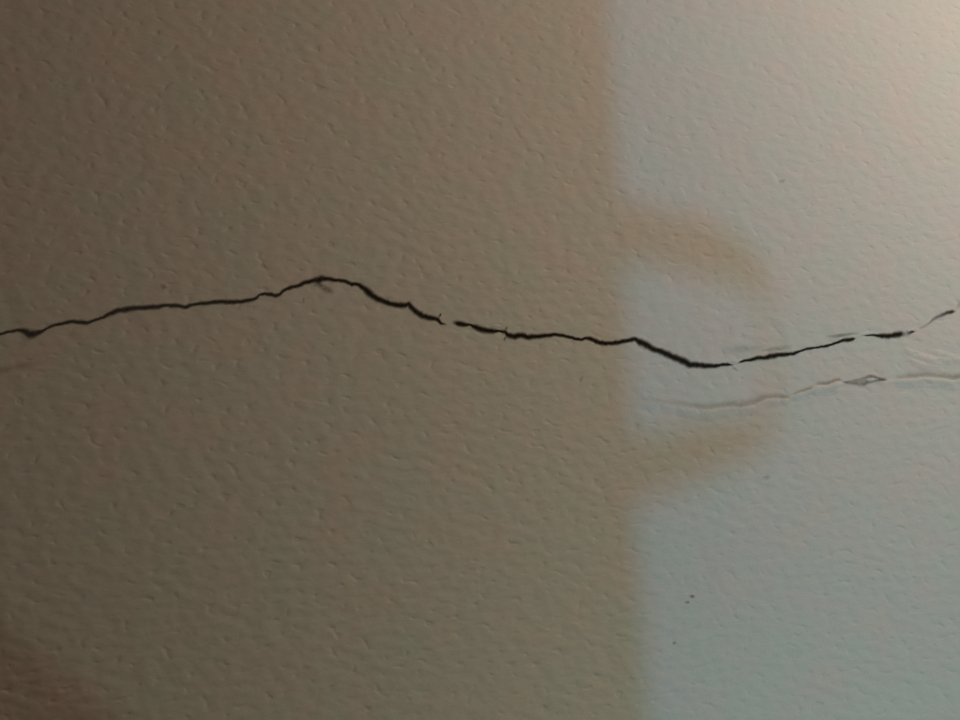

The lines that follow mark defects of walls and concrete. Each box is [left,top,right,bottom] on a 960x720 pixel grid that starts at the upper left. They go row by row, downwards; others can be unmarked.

crack [0,276,954,368]